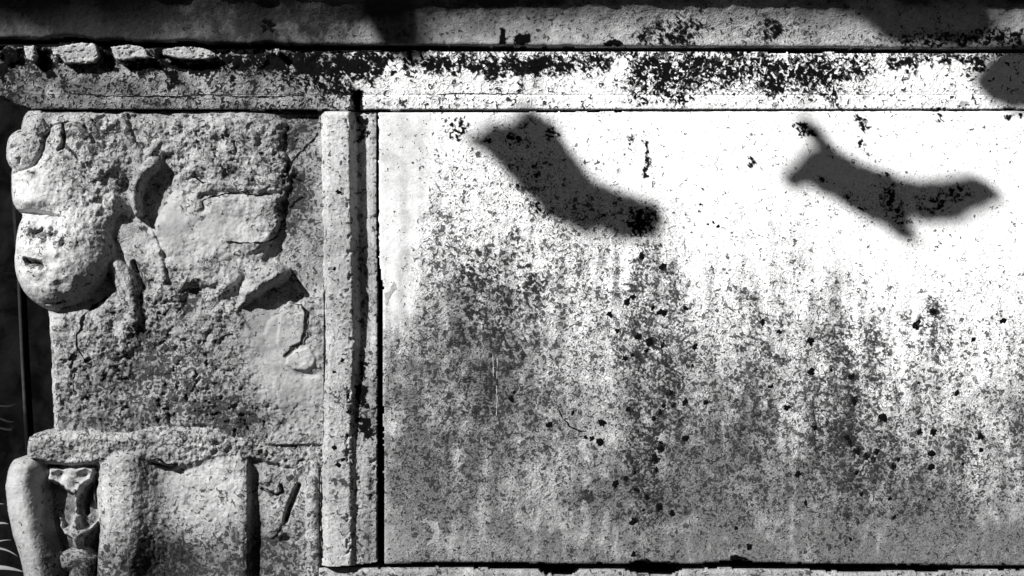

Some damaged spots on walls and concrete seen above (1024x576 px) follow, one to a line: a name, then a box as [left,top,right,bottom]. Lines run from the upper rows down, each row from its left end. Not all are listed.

damp [0,47,23,87]
damp [37,47,57,78]
damp [103,47,989,143]
damp [441,225,547,452]
damp [612,243,698,535]
damp [730,297,789,466]
damp [803,307,902,526]
damp [915,295,955,394]
damp [950,404,985,522]